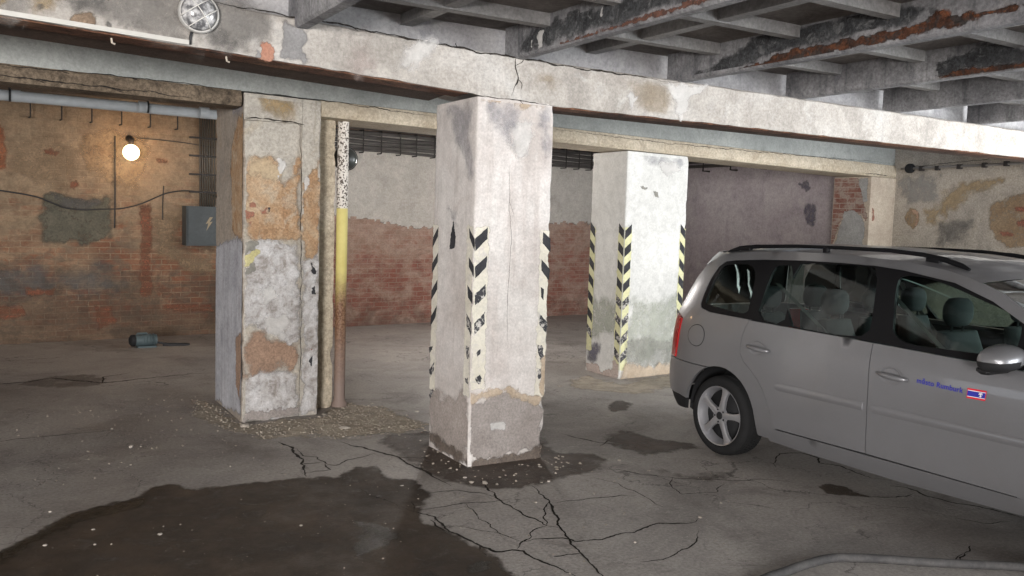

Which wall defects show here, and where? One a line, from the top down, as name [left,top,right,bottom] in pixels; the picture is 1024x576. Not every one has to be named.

crack [216,2,295,18]
crack [322,21,887,176]
corrosion [743,4,1024,68]
corrosion [939,62,1024,78]
peeling [215,113,320,415]
spalling [831,178,875,245]
spalling [990,193,1024,248]
spalling [429,356,545,465]
damp [0,432,606,576]
crack [279,442,1022,576]